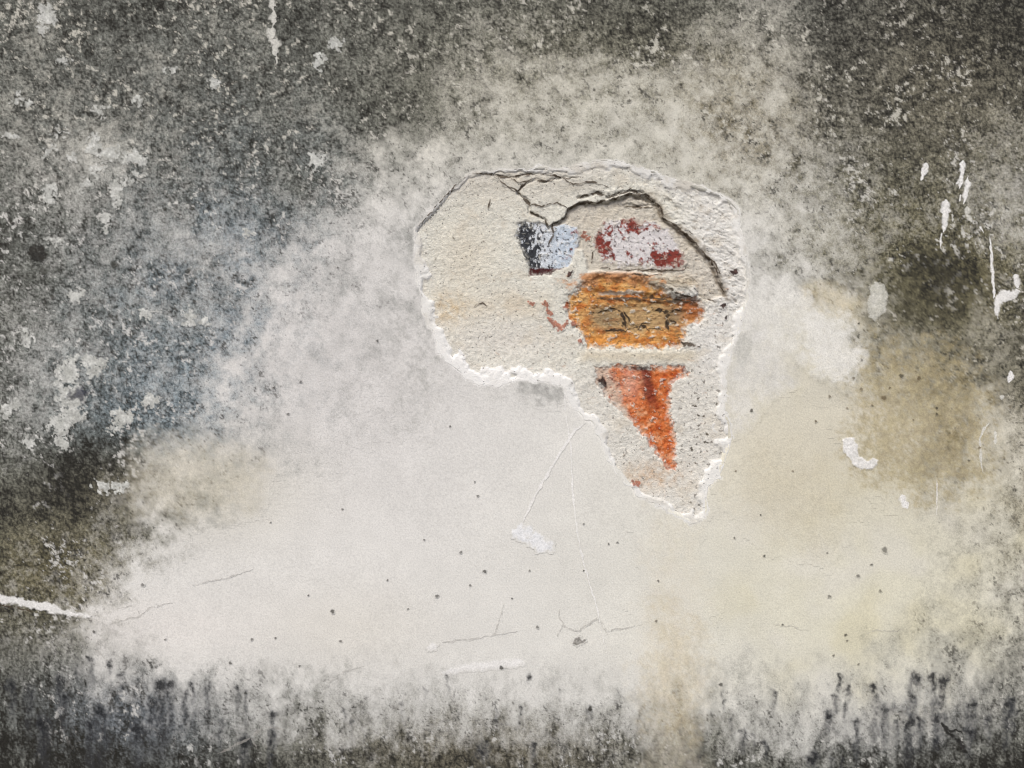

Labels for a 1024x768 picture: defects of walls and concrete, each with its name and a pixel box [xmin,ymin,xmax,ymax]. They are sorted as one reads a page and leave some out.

leakage [0,0,1024,575]
crack [420,172,727,349]
flaking render [415,161,751,525]
peeling [993,288,1022,320]
leakage [0,615,641,768]
crack [443,605,518,643]
crack [557,610,640,637]
leakage [703,323,1024,768]